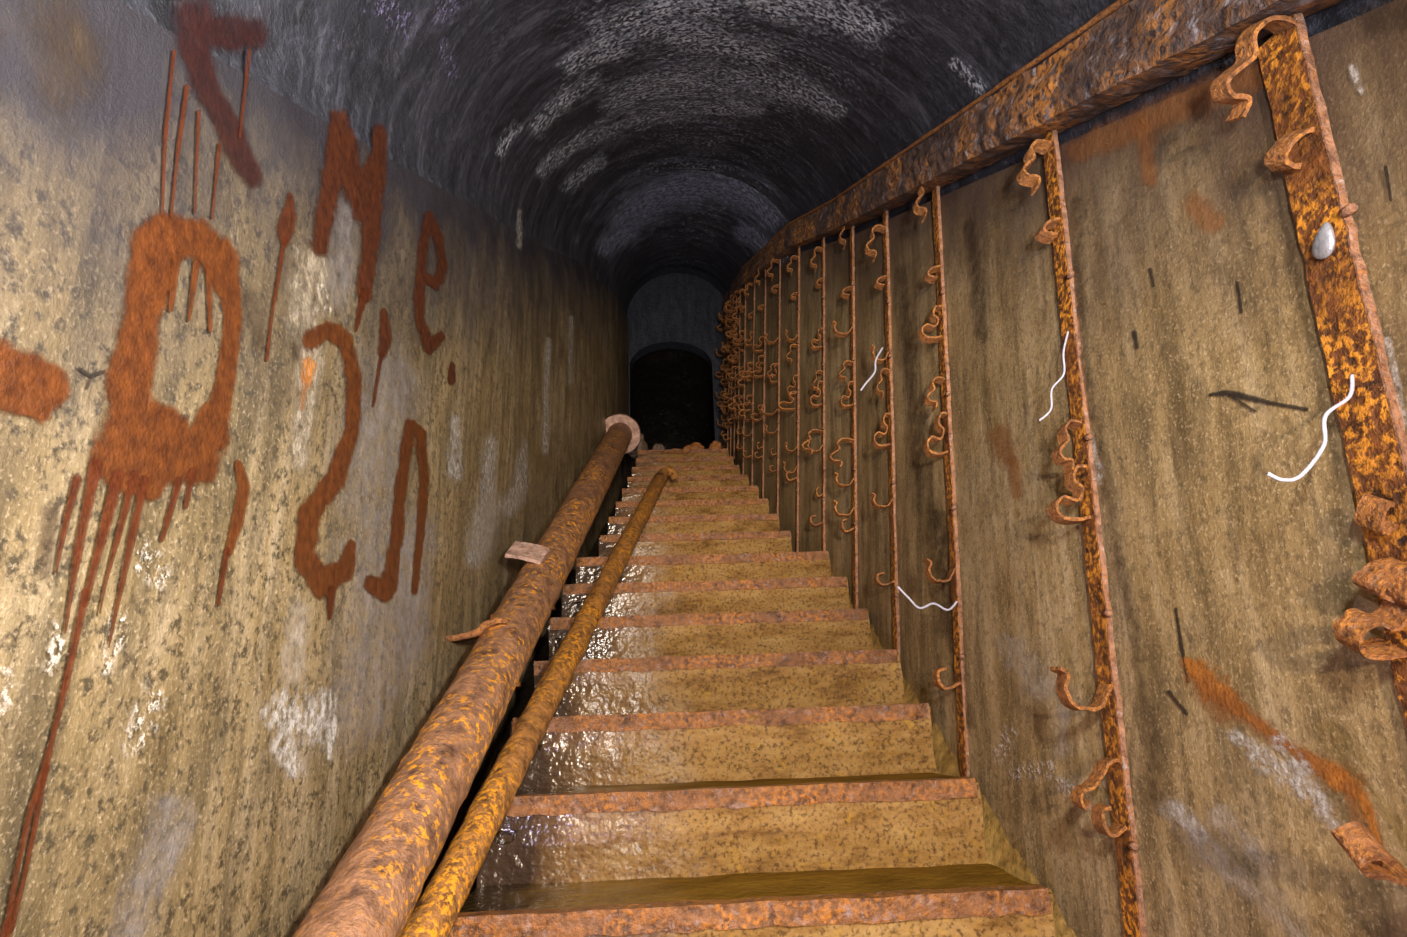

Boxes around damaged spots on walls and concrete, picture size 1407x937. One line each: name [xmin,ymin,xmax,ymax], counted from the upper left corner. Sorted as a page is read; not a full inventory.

damp [265,609,337,777]
rust [1182,657,1382,844]